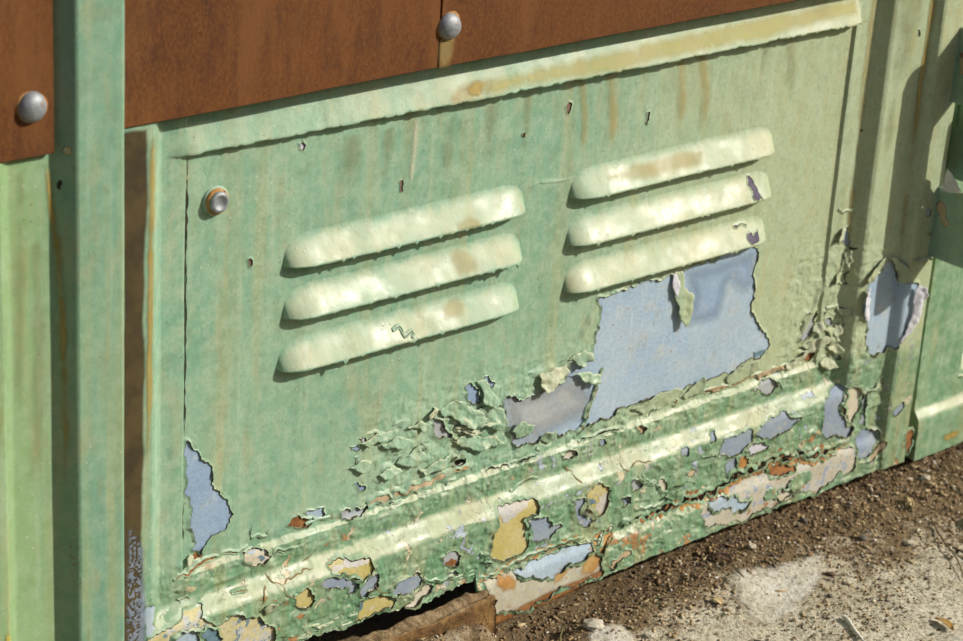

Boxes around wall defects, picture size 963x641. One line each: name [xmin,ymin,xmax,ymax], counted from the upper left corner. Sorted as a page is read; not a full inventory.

rust [0,0,54,163]
rust [469,2,855,95]
rust [914,0,935,132]
rust [47,173,60,283]
rust [124,0,796,641]
peeling [284,221,780,530]
peeling [820,376,888,464]
peeling [796,254,933,370]
peeling [127,530,279,641]
peeling [293,550,435,623]
peeling [486,495,564,565]
rust [698,444,859,531]